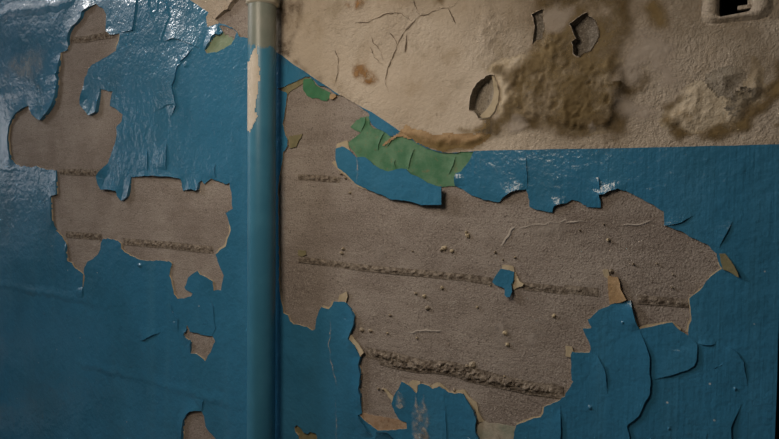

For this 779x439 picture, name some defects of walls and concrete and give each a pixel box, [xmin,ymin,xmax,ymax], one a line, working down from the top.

peeling [247,45,260,132]
crack [353,0,460,93]
flaking render [532,9,545,45]
leakage [408,0,669,153]
flaking render [569,11,600,58]
leakage [706,74,779,138]
peeling [1,0,248,304]
peeling [279,73,739,439]
peeling [178,322,215,360]
peeling [174,398,215,439]